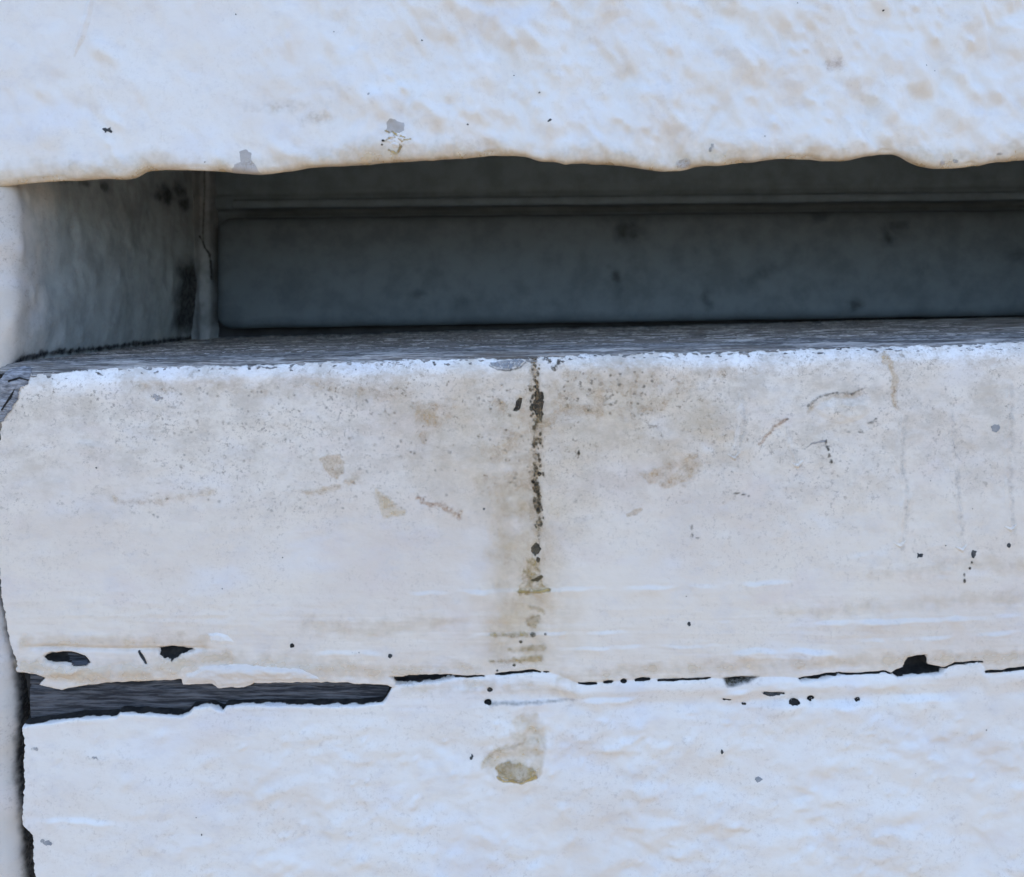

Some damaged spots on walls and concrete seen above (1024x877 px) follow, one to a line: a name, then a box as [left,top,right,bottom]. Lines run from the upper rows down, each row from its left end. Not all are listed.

peeling [381,119,411,154]
leakage [175,265,197,331]
crack [529,358,560,582]
crack [578,676,756,686]
crack [799,655,1024,679]
leakage [496,761,537,784]